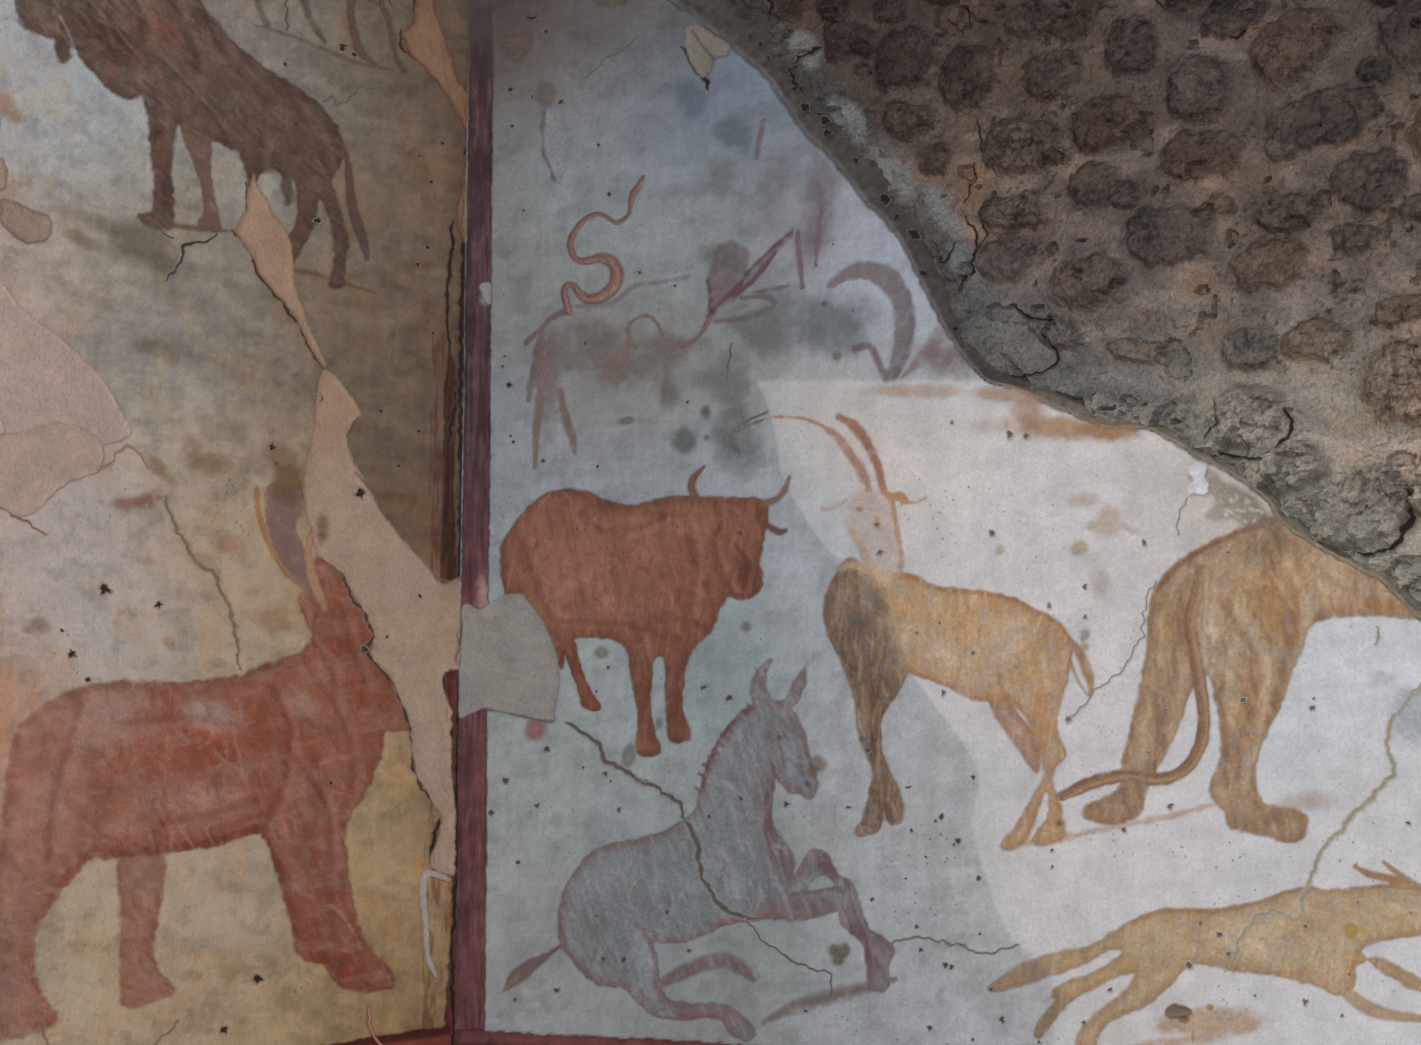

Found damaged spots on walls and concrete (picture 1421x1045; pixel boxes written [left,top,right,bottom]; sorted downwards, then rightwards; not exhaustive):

spalling [0,158,52,243]
peeling [0,286,132,516]
spalling [668,0,1421,621]
spalling [99,583,113,596]
spalling [236,174,461,979]
crack [341,567,460,1045]
crack [565,721,832,996]
crack [888,936,1019,955]
crack [1232,683,1421,962]